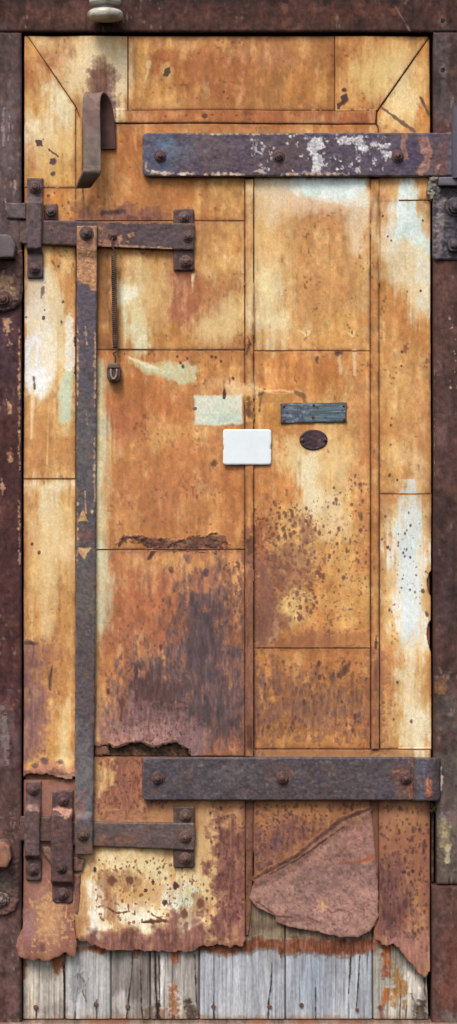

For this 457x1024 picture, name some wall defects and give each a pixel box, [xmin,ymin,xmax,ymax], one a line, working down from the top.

spalling [95,597,242,757]
corrosion [93,523,399,822]
corrosion [17,759,434,1019]